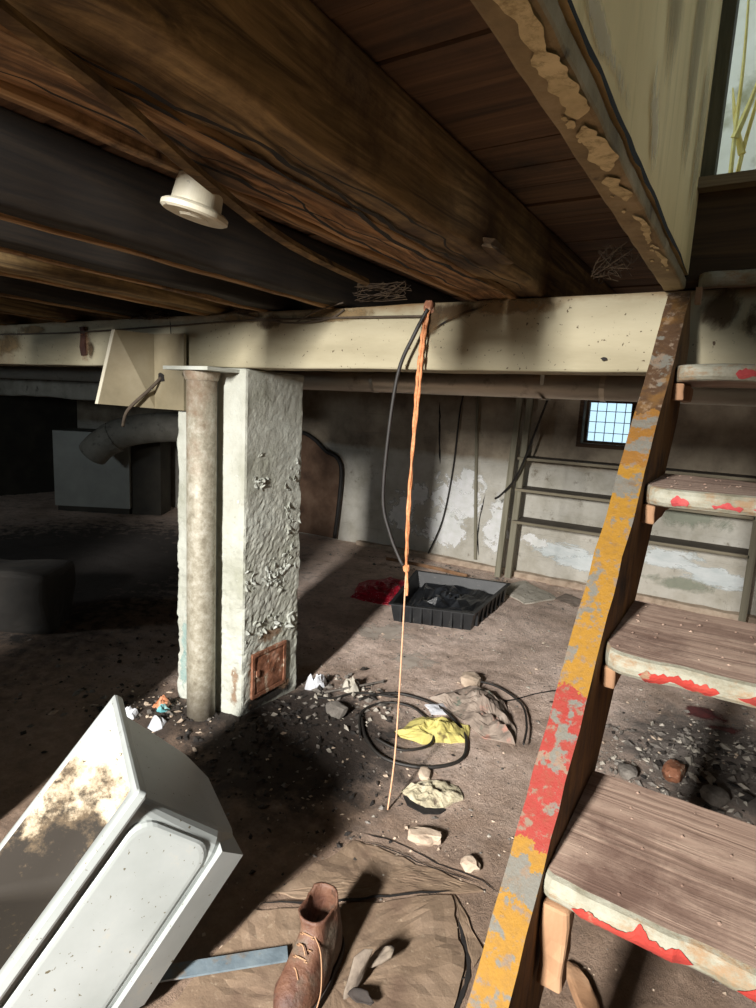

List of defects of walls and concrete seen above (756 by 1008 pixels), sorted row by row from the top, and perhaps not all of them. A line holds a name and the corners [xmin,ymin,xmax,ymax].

peeling [493,0,669,271]
peeling [253,476,269,490]
peeling [245,502,301,596]
leakage [521,533,594,572]
leakage [644,546,744,591]
peeling [245,611,296,644]
rust [262,628,280,642]